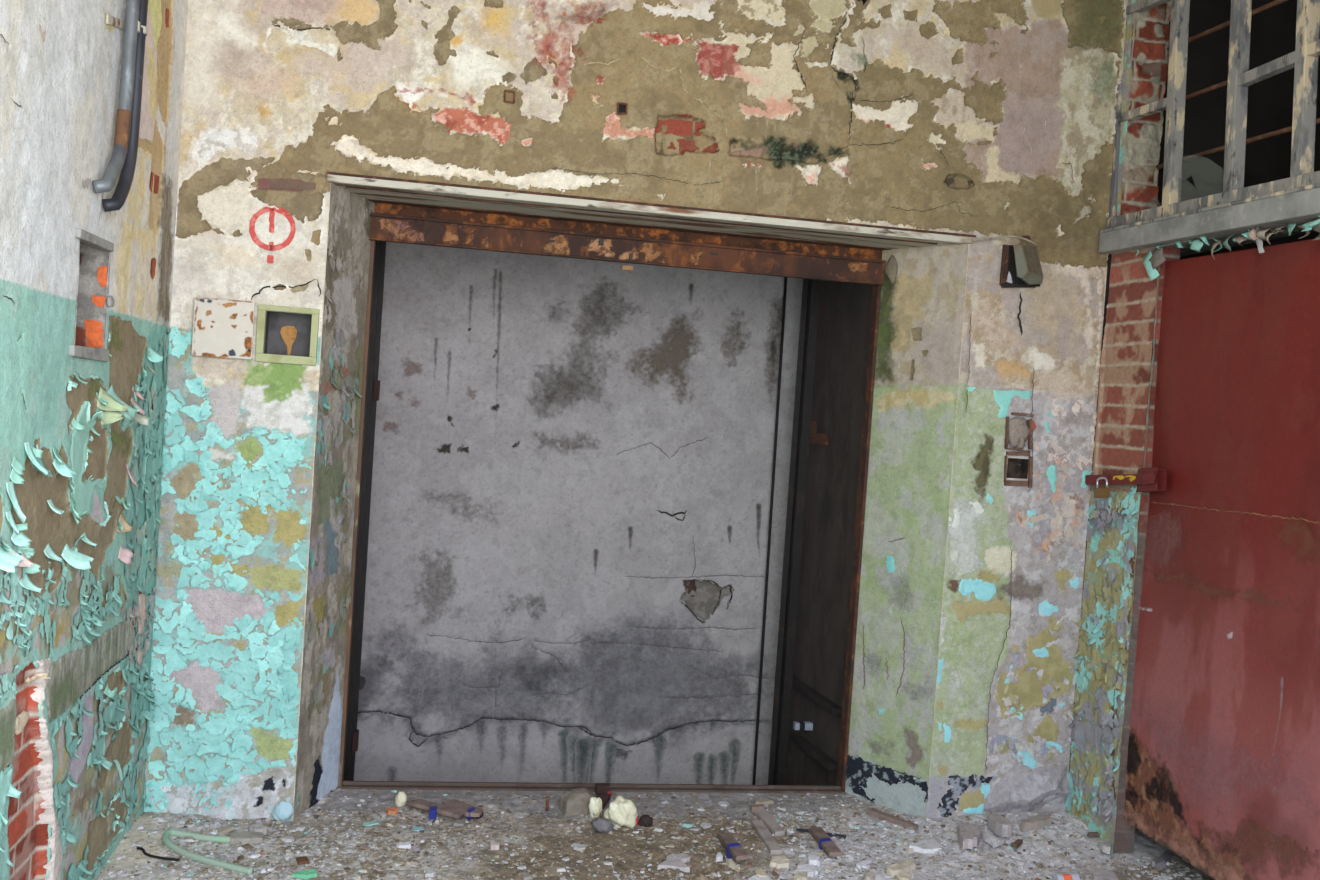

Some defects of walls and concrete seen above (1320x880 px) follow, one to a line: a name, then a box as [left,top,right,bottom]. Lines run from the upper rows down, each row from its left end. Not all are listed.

corrosion [327,172,976,273]
peeling [1175,216,1320,260]
leakage [534,283,621,413]
leakage [633,318,696,396]
flaking render [175,0,1166,823]
crack [1016,293,1024,336]
peeling [0,281,362,880]
crack [358,510,766,747]
leakage [404,622,742,755]
leakage [560,731,627,781]
leakage [709,743,737,779]
corrosion [1110,646,1308,880]